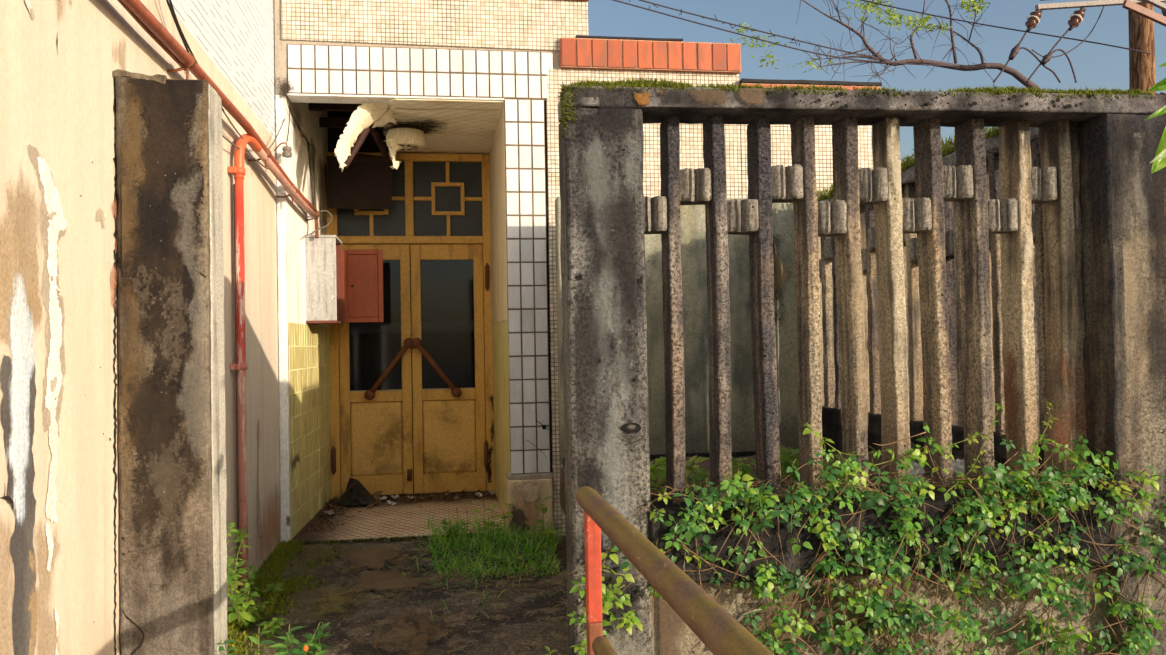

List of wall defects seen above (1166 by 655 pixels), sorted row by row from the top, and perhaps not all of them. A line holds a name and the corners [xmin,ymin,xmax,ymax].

leakage [575,87,642,135]
peeling [28,145,67,572]
crack [113,78,145,655]
leakage [117,45,205,588]
leakage [575,194,639,442]
leakage [1149,167,1166,377]
leakage [601,534,644,655]
leakage [1157,512,1166,572]